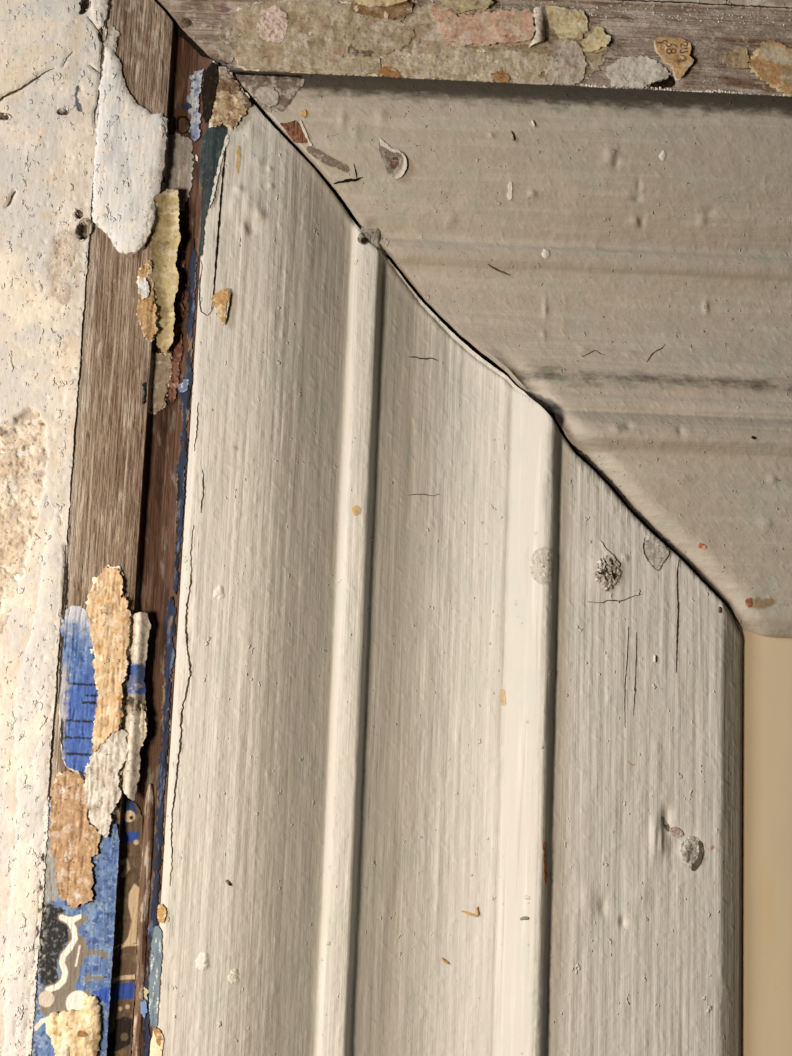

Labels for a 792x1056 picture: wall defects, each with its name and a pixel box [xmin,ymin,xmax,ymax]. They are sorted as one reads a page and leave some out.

flaking render [545,39,588,86]
peeling [135,198,156,251]